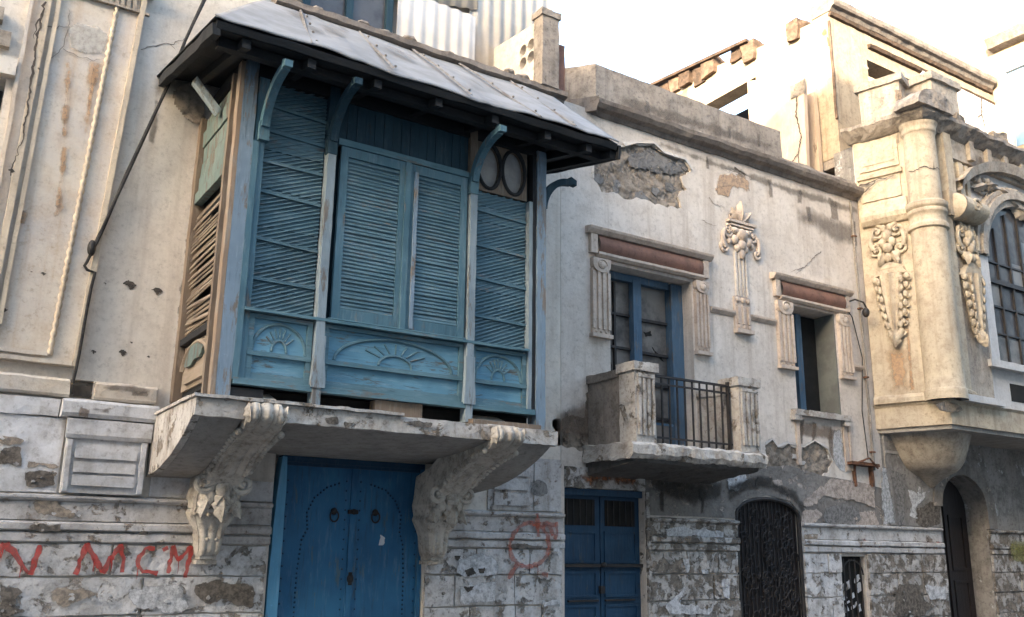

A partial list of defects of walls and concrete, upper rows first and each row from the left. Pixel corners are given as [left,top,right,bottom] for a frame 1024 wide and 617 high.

crack [10,1,104,176]
crack [792,96,802,163]
spalling [591,140,692,209]
peeling [716,173,749,196]
peeling [0,436,81,532]
spalling [765,438,879,526]
peeling [666,526,724,538]
peeling [128,580,255,613]
peeling [665,587,712,615]
peeling [721,579,730,600]